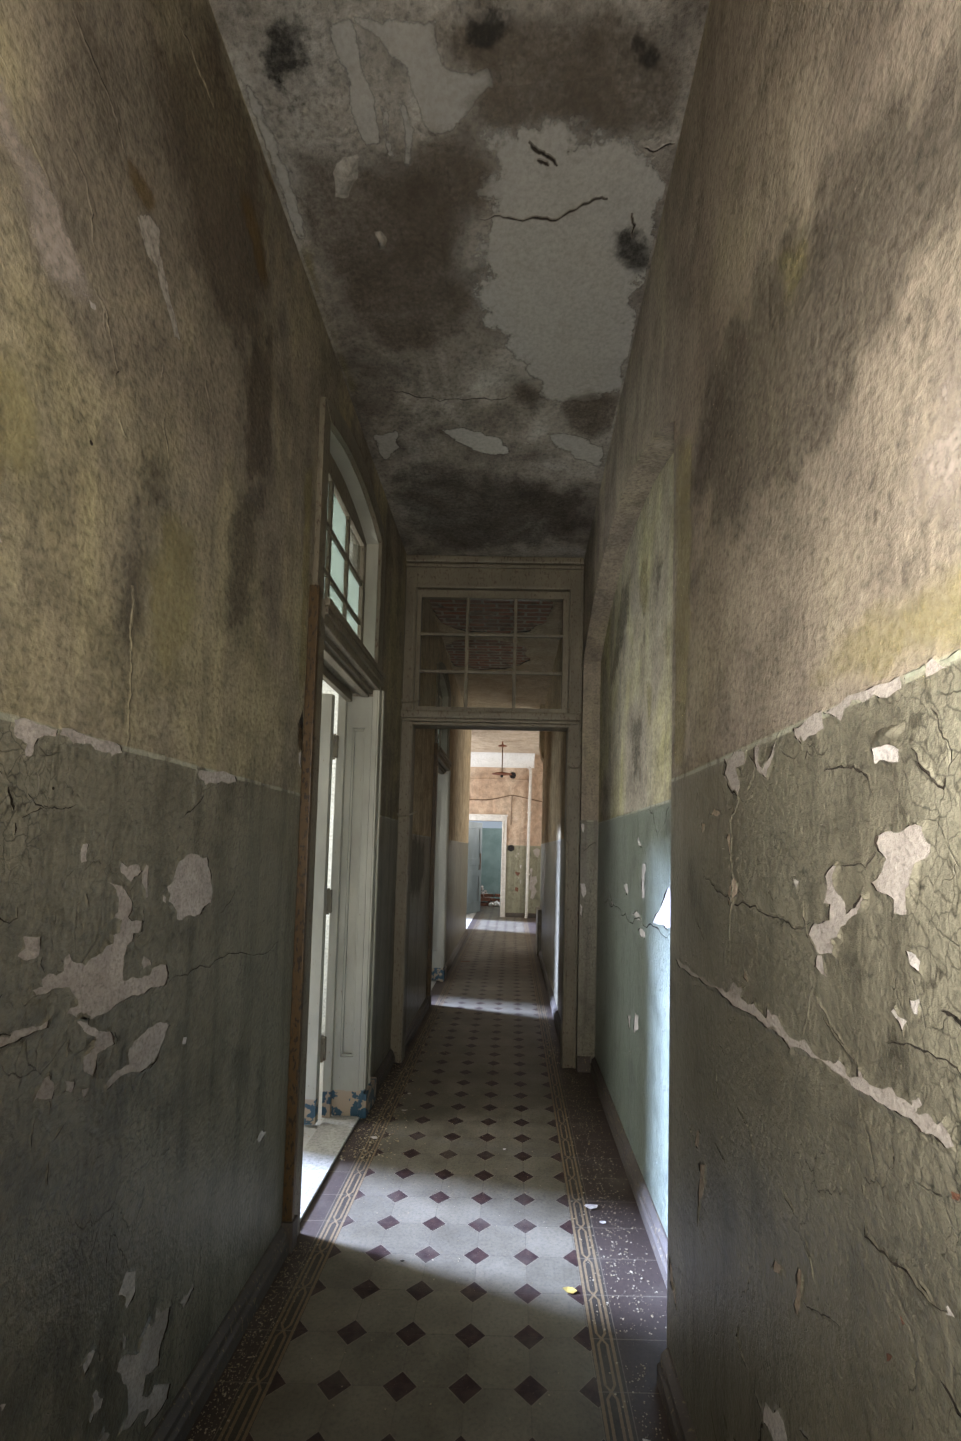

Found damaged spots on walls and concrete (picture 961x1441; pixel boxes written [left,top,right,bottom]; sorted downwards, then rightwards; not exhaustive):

damp [0,88,84,295]
damp [138,215,180,340]
crack [528,140,558,167]
crack [480,196,636,239]
flaking render [473,114,666,405]
mould [618,229,650,271]
damp [702,87,961,519]
peeling [0,849,213,1105]
peeling [674,955,961,1159]
crack [705,730,961,1078]
peeling [807,816,930,981]
crack [860,1184,949,1316]